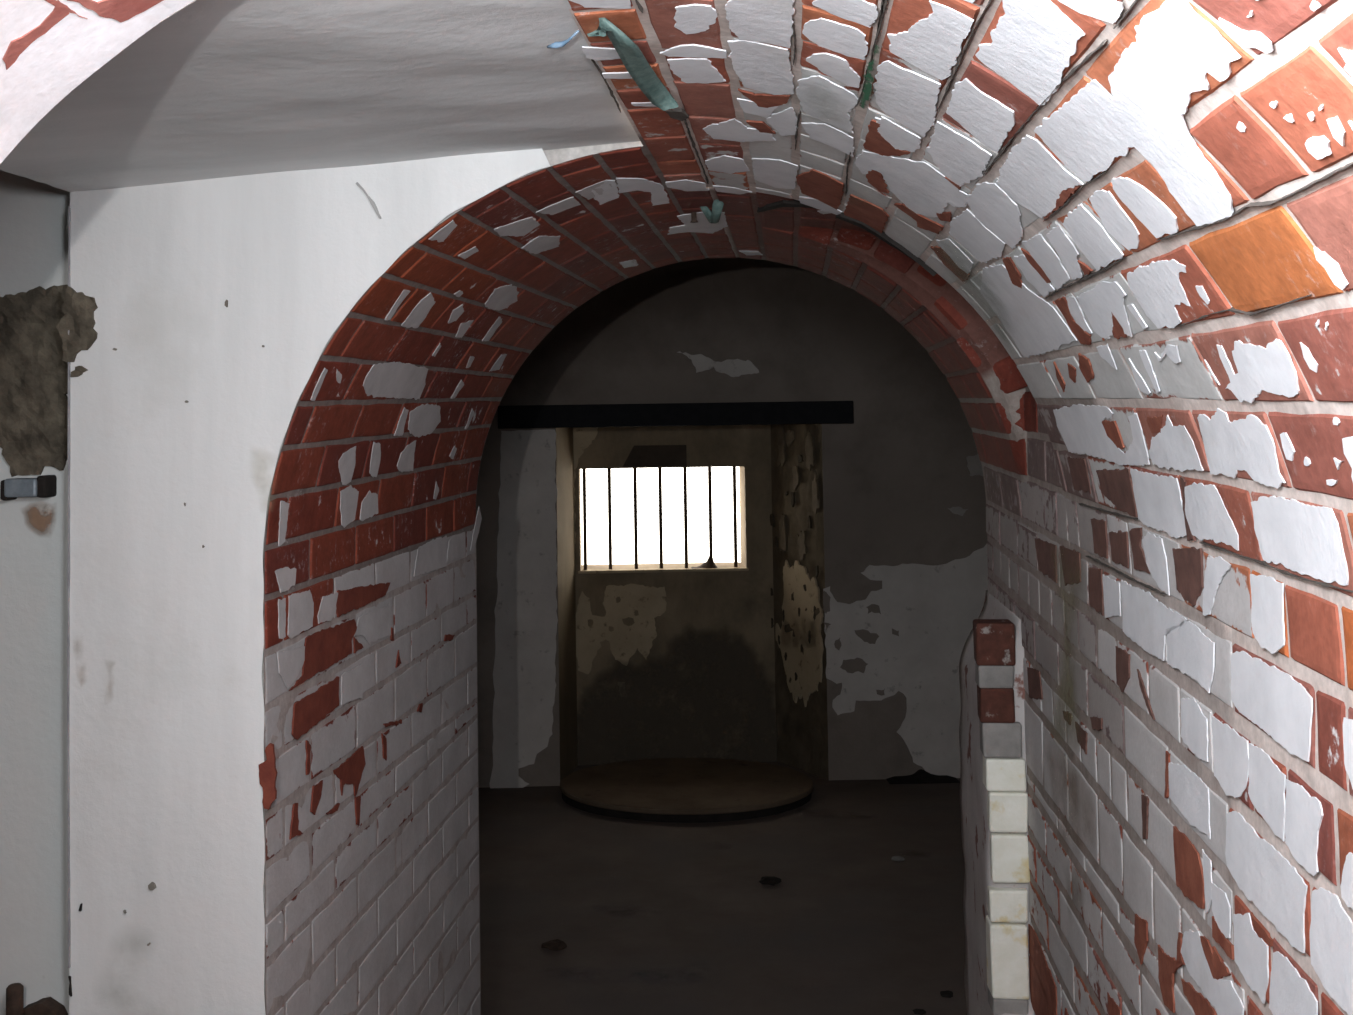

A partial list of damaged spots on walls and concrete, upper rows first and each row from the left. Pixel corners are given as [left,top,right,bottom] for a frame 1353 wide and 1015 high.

flaking render [2,0,163,70]
peeling [384,290,435,328]
spalling [0,285,98,477]
peeling [310,368,342,401]
peeling [363,343,475,472]
corrosion [26,506,53,533]
peeling [278,501,290,546]
peeling [338,442,381,528]
peeling [489,0,1353,1015]
flaking render [275,567,402,840]
water stain [577,632,778,766]
spalling [258,743,278,810]